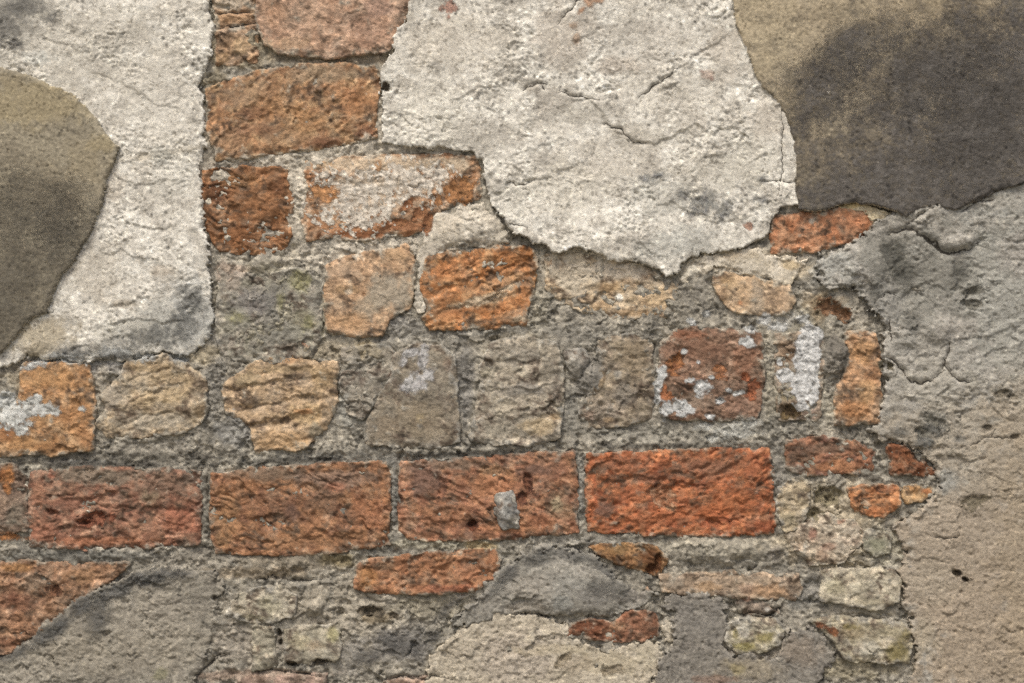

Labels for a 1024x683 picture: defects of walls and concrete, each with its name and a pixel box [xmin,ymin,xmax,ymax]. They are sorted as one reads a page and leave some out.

peeling [731,0,783,110]
peeling [194,0,216,248]
crack [522,82,643,144]
damp [787,0,1024,217]
spalling [308,155,475,236]
peeling [513,228,684,276]
damp [738,312,810,348]
spalling [814,296,854,324]
damp [0,391,60,436]
damp [652,365,761,443]
spalling [807,485,845,521]
spalling [355,606,399,619]